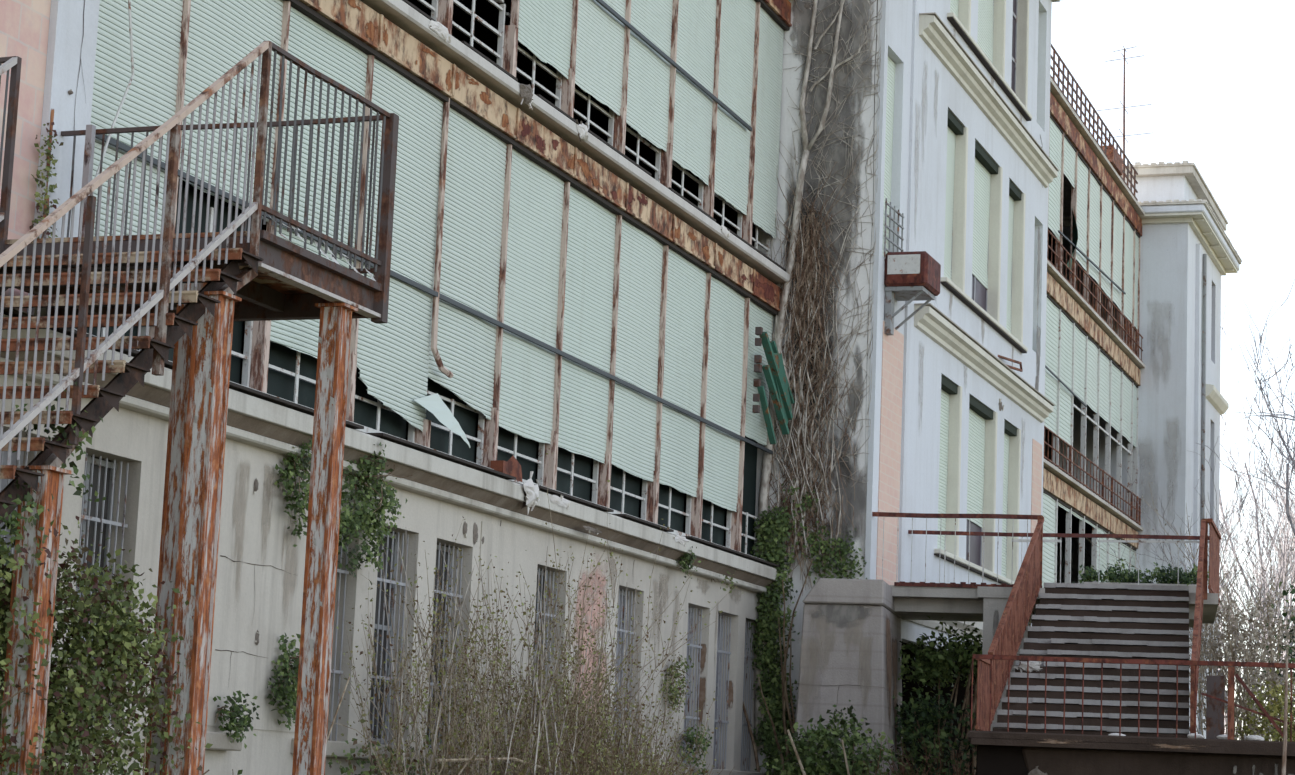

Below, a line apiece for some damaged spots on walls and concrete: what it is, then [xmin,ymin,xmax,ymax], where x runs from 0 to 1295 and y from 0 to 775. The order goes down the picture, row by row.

corrosion [446,70,492,105]
corrosion [502,114,648,210]
corrosion [671,226,723,267]
corrosion [197,314,212,393]
corrosion [319,328,334,409]
corrosion [300,676,312,769]